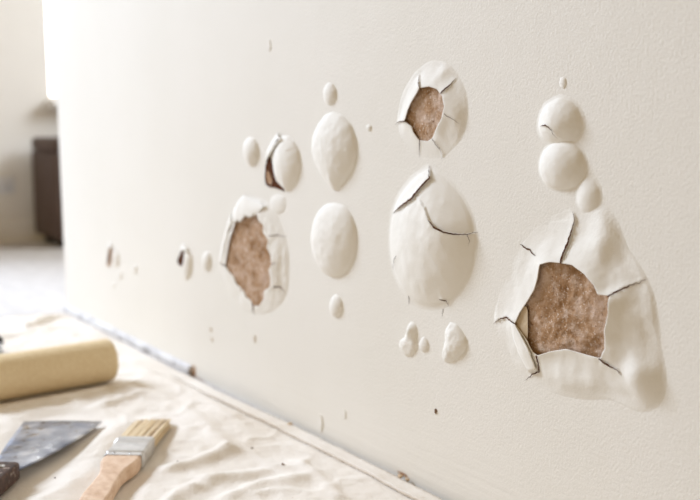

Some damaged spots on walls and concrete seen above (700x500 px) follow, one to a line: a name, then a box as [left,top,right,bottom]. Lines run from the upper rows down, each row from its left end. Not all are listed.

peeling [396,60,469,159]
peeling [218,195,290,315]
peeling [494,204,667,413]